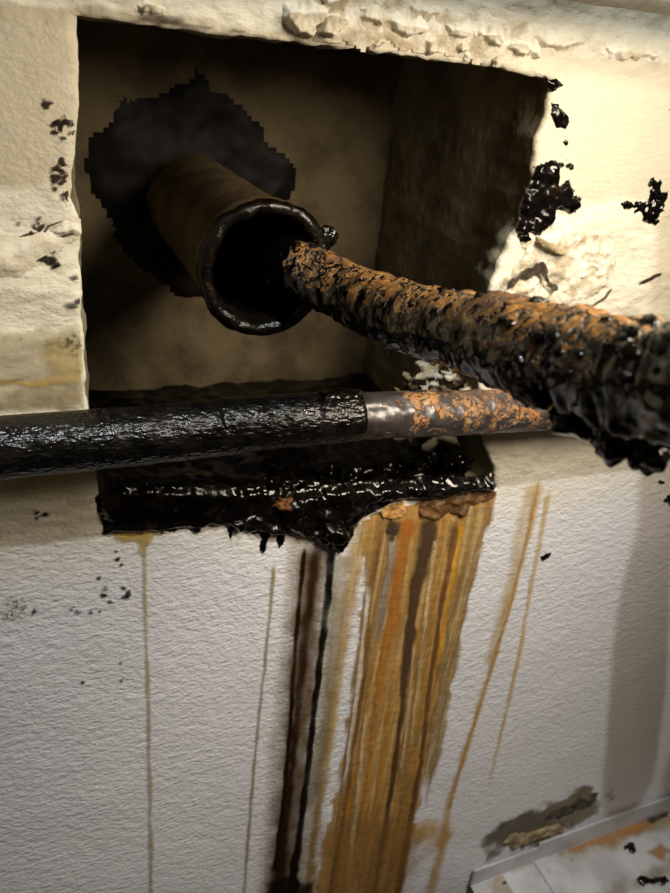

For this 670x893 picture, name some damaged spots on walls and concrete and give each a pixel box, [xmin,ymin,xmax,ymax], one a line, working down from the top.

peeling [137,0,193,27]
spalling [282,0,585,67]
spalling [604,40,658,61]
spalling [495,226,616,306]
water stain [115,532,154,621]
water stain [269,550,350,893]
rust [306,490,497,893]
water stain [411,488,550,890]